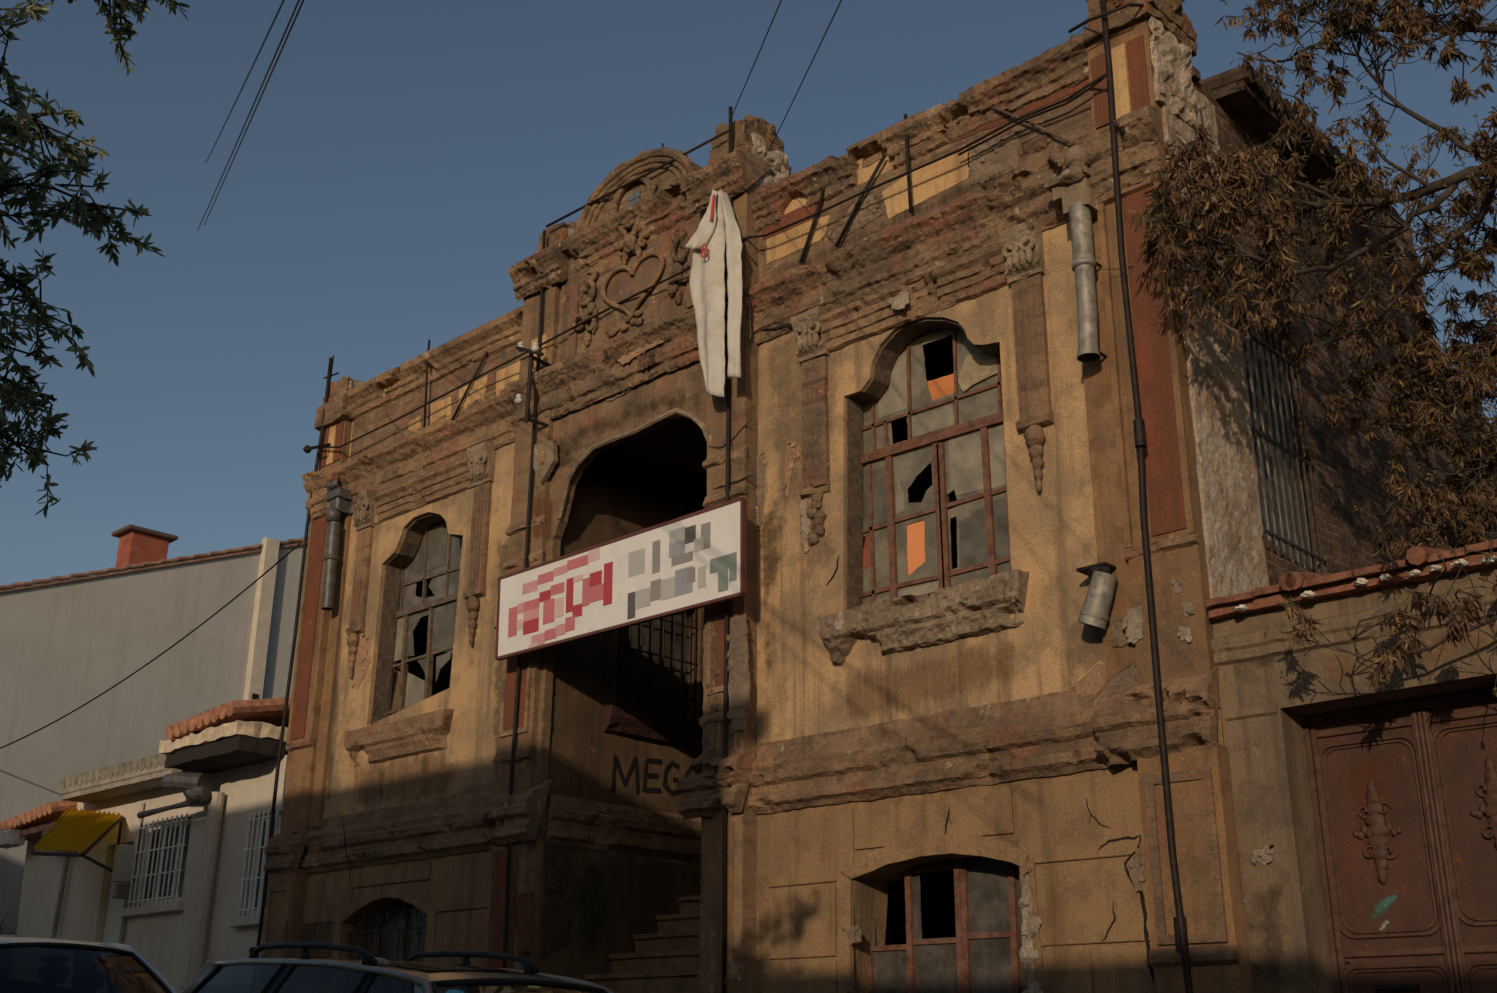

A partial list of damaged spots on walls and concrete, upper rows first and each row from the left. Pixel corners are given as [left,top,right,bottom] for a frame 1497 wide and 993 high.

flaking render [842,925,862,945]
crack [1086,798,1155,984]